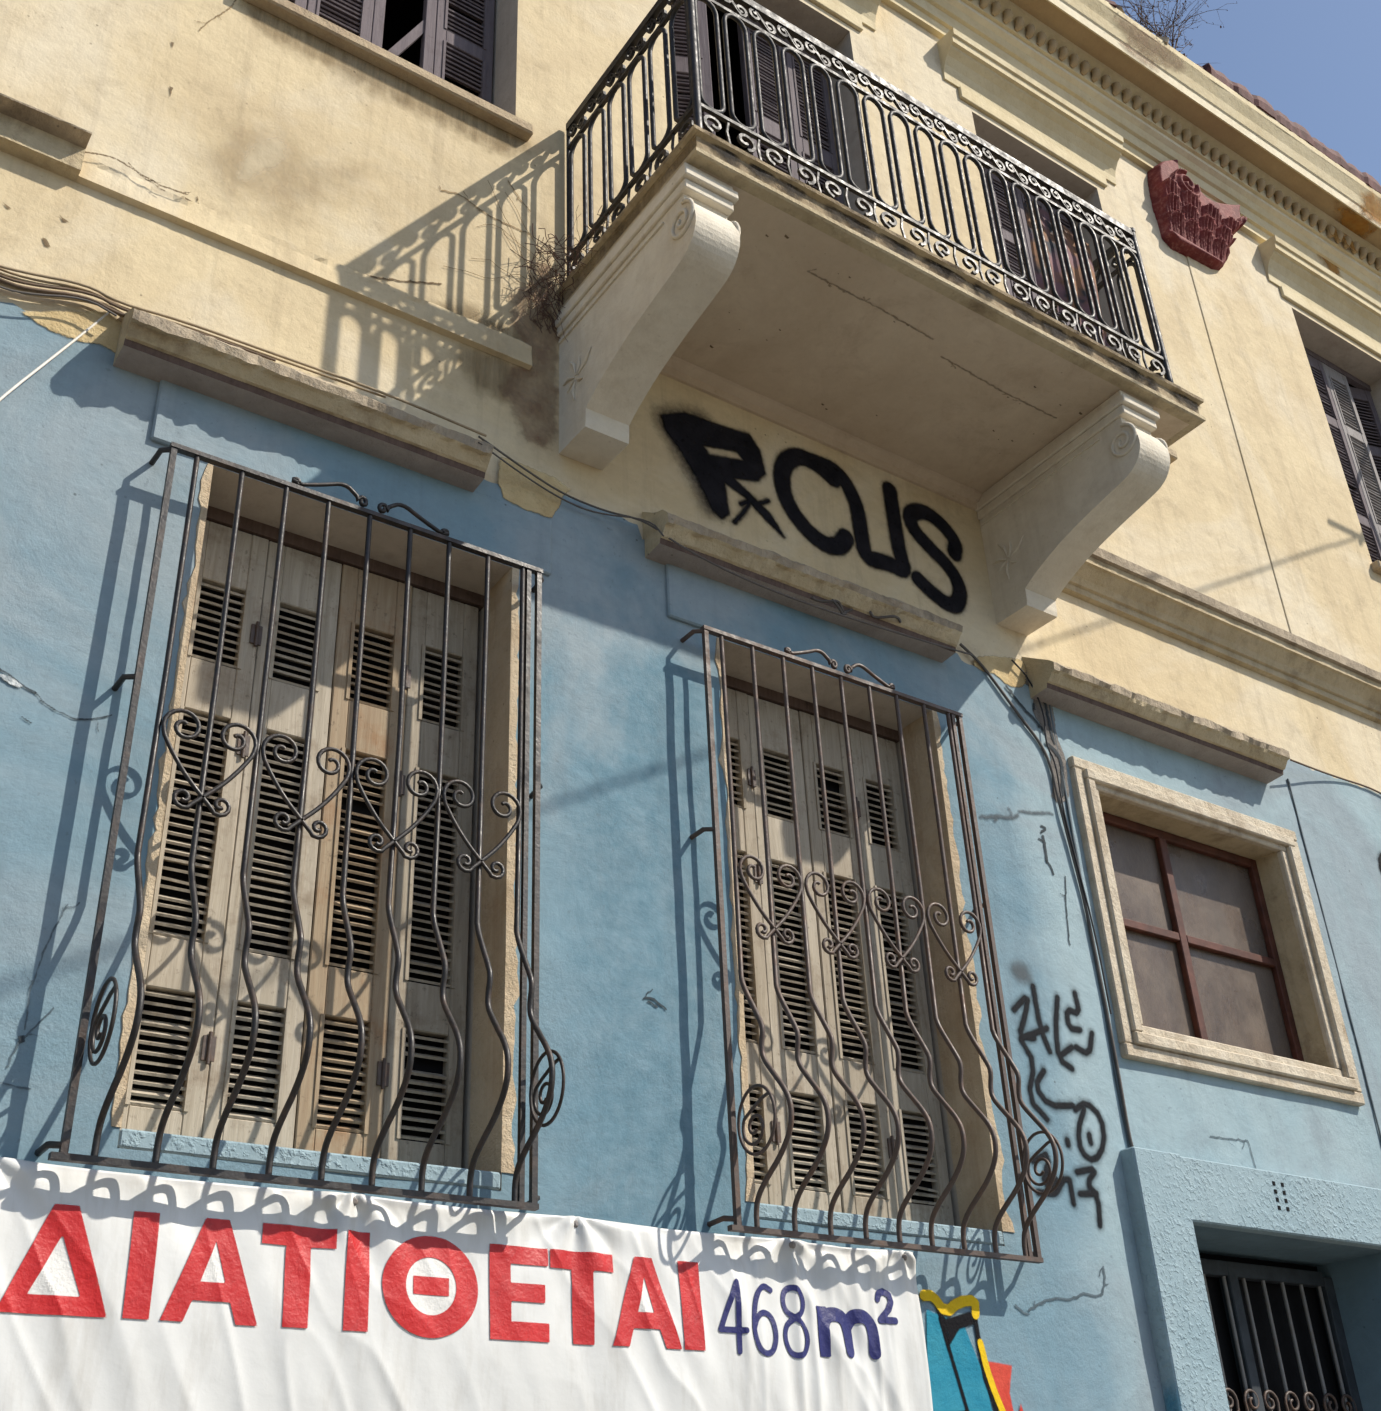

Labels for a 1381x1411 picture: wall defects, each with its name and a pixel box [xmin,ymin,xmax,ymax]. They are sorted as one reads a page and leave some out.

crack [85,151,199,204]
corrosion [1332,193,1381,252]
crack [368,275,442,285]
corrosion [1320,257,1340,275]
peeling [23,311,121,353]
peeling [498,457,571,518]
crack [0,668,112,731]
crack [0,902,80,1090]